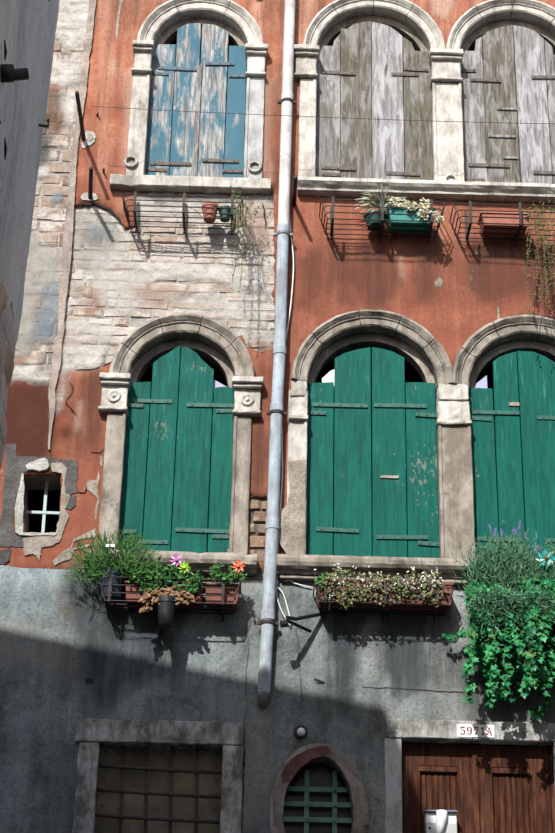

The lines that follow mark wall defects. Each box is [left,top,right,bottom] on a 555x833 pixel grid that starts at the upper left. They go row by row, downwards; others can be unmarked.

spalling [12,0,275,385]
spalling [0,548,12,565]
peeling [23,456,103,566]